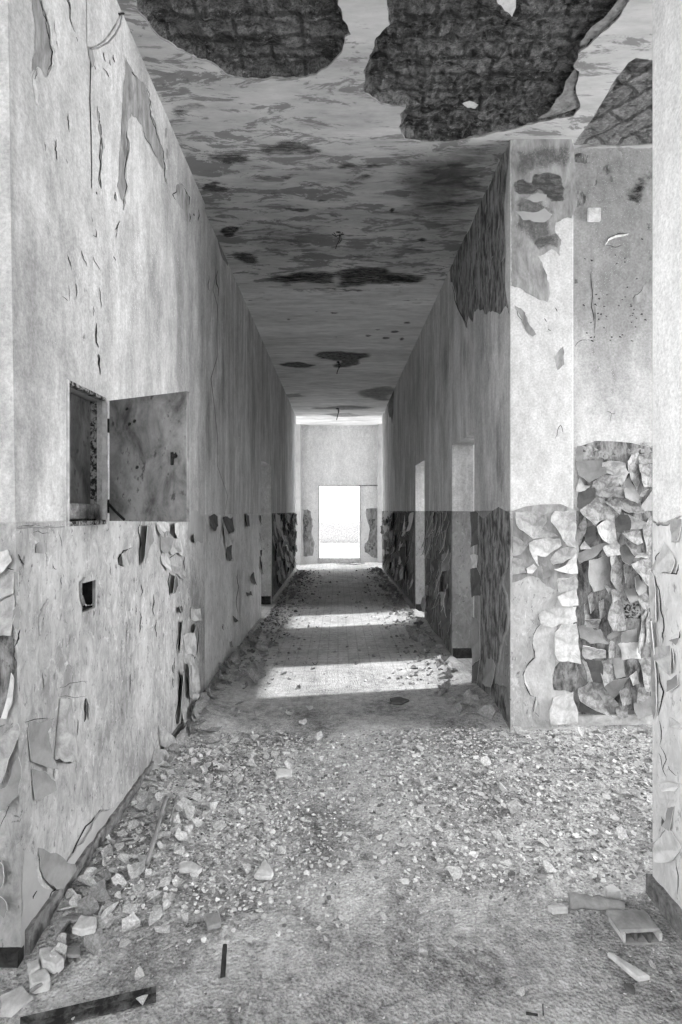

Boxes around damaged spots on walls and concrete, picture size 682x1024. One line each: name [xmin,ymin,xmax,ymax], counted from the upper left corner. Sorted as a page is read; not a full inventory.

spalling [135,0,351,80]
peeling [115,59,200,223]
leakage [202,182,228,192]
leakage [209,153,249,164]
leakage [261,140,318,155]
spalling [363,0,630,337]
leakage [233,253,257,263]
leakage [271,257,423,292]
leakage [280,351,369,368]
peeling [110,509,315,630]
peeling [470,441,682,730]
peeling [0,549,79,827]